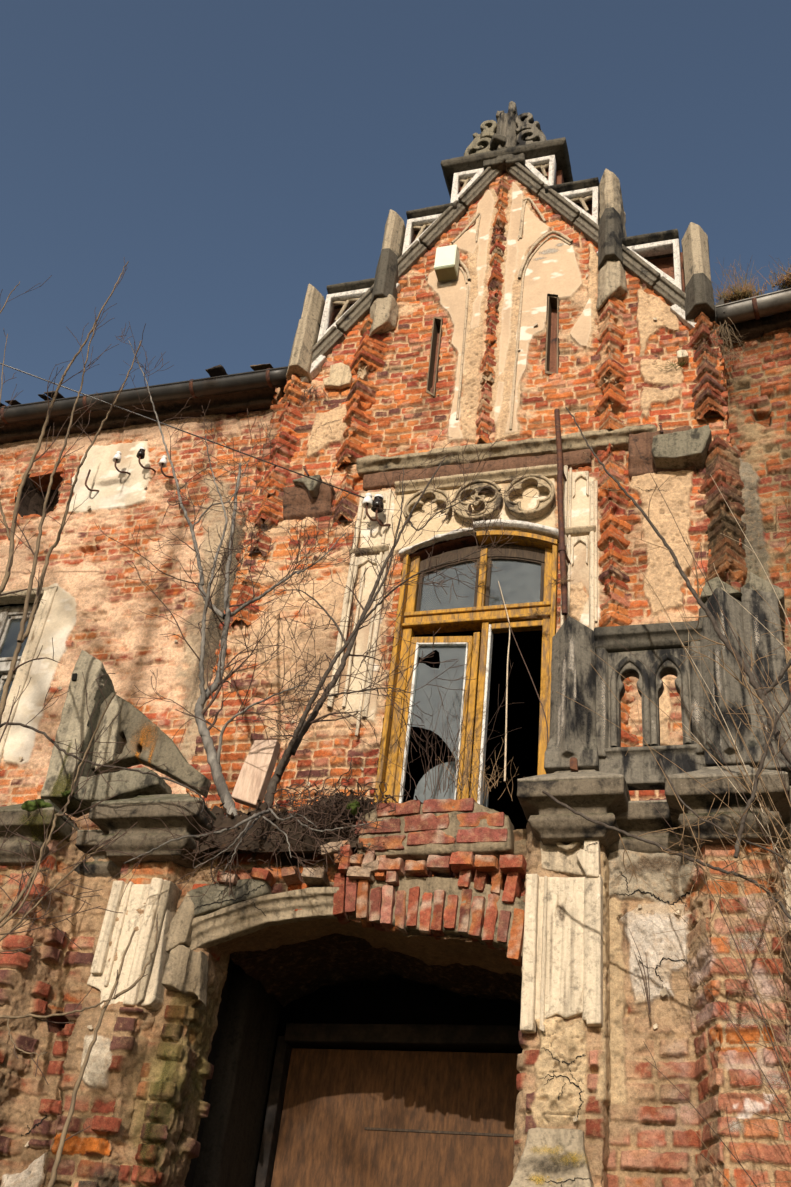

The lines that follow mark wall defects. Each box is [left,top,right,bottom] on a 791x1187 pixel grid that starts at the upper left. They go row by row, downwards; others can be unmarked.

spalling [518,203,594,439]
spalling [648,318,689,364]
spalling [76,544,101,555]
spalling [2,582,188,768]
leakage [557,640,605,747]
leakage [690,702,699,744]
leakage [713,613,752,733]
leakage [755,618,774,690]
crack [638,956,688,987]
spalling [48,1012,71,1033]
crack [539,1048,586,1118]
spalling [51,1132,112,1157]